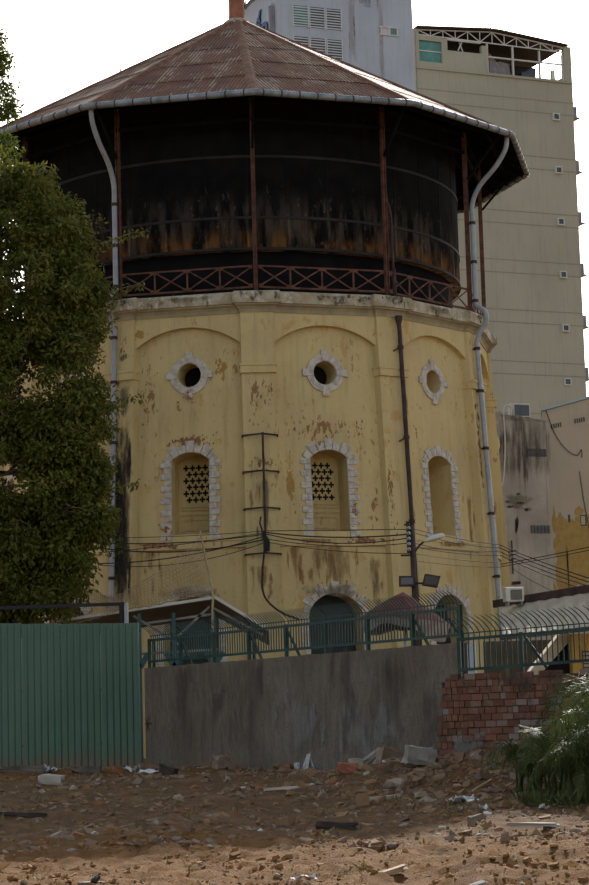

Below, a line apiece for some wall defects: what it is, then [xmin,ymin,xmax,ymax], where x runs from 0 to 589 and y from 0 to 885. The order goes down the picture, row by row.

spalling [248,379,273,425]
peeling [164,434,219,451]
peeling [286,417,363,446]
leakage [115,432,131,601]
leakage [506,493,529,511]
peeling [552,506,589,590]